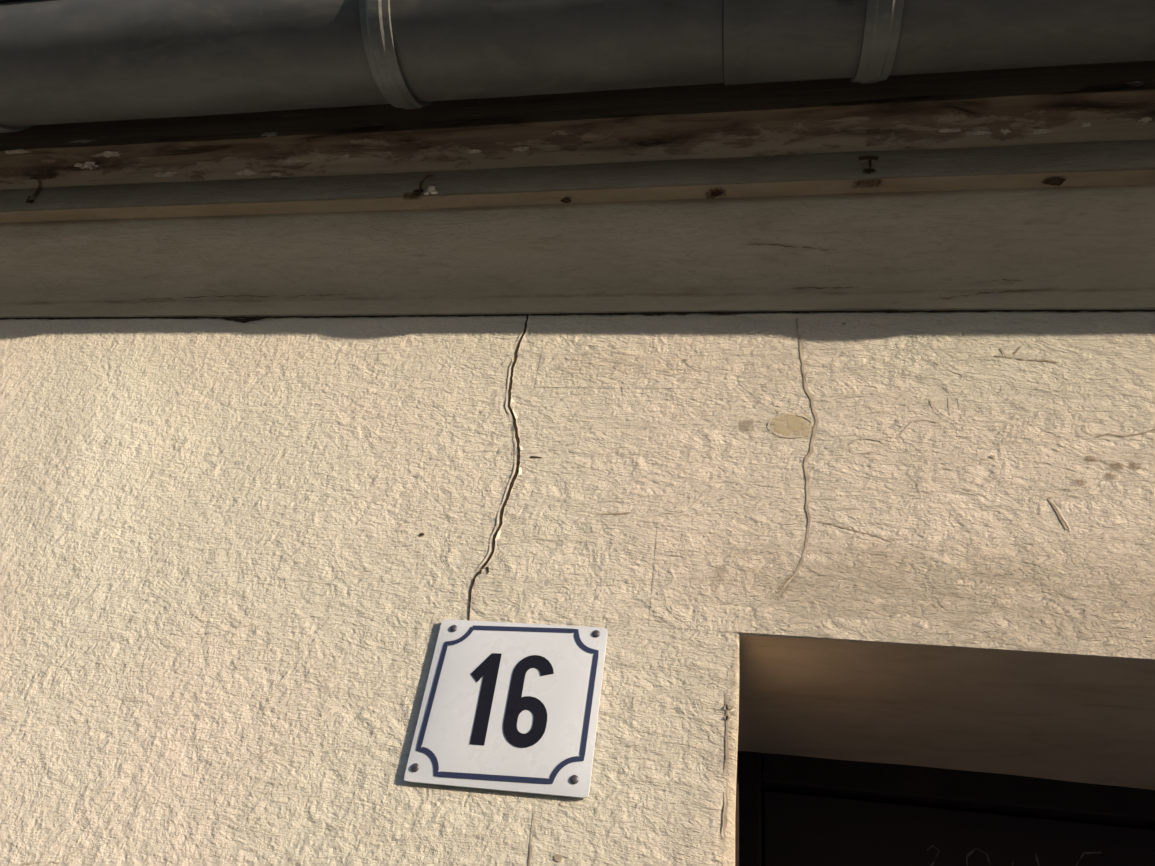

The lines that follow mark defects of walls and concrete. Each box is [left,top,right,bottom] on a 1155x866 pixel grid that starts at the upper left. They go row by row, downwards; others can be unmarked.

water stain [1043,84,1155,114]
crack [748,243,837,251]
crack [0,279,1155,621]
crack [528,808,536,866]
crack [18,840,111,866]